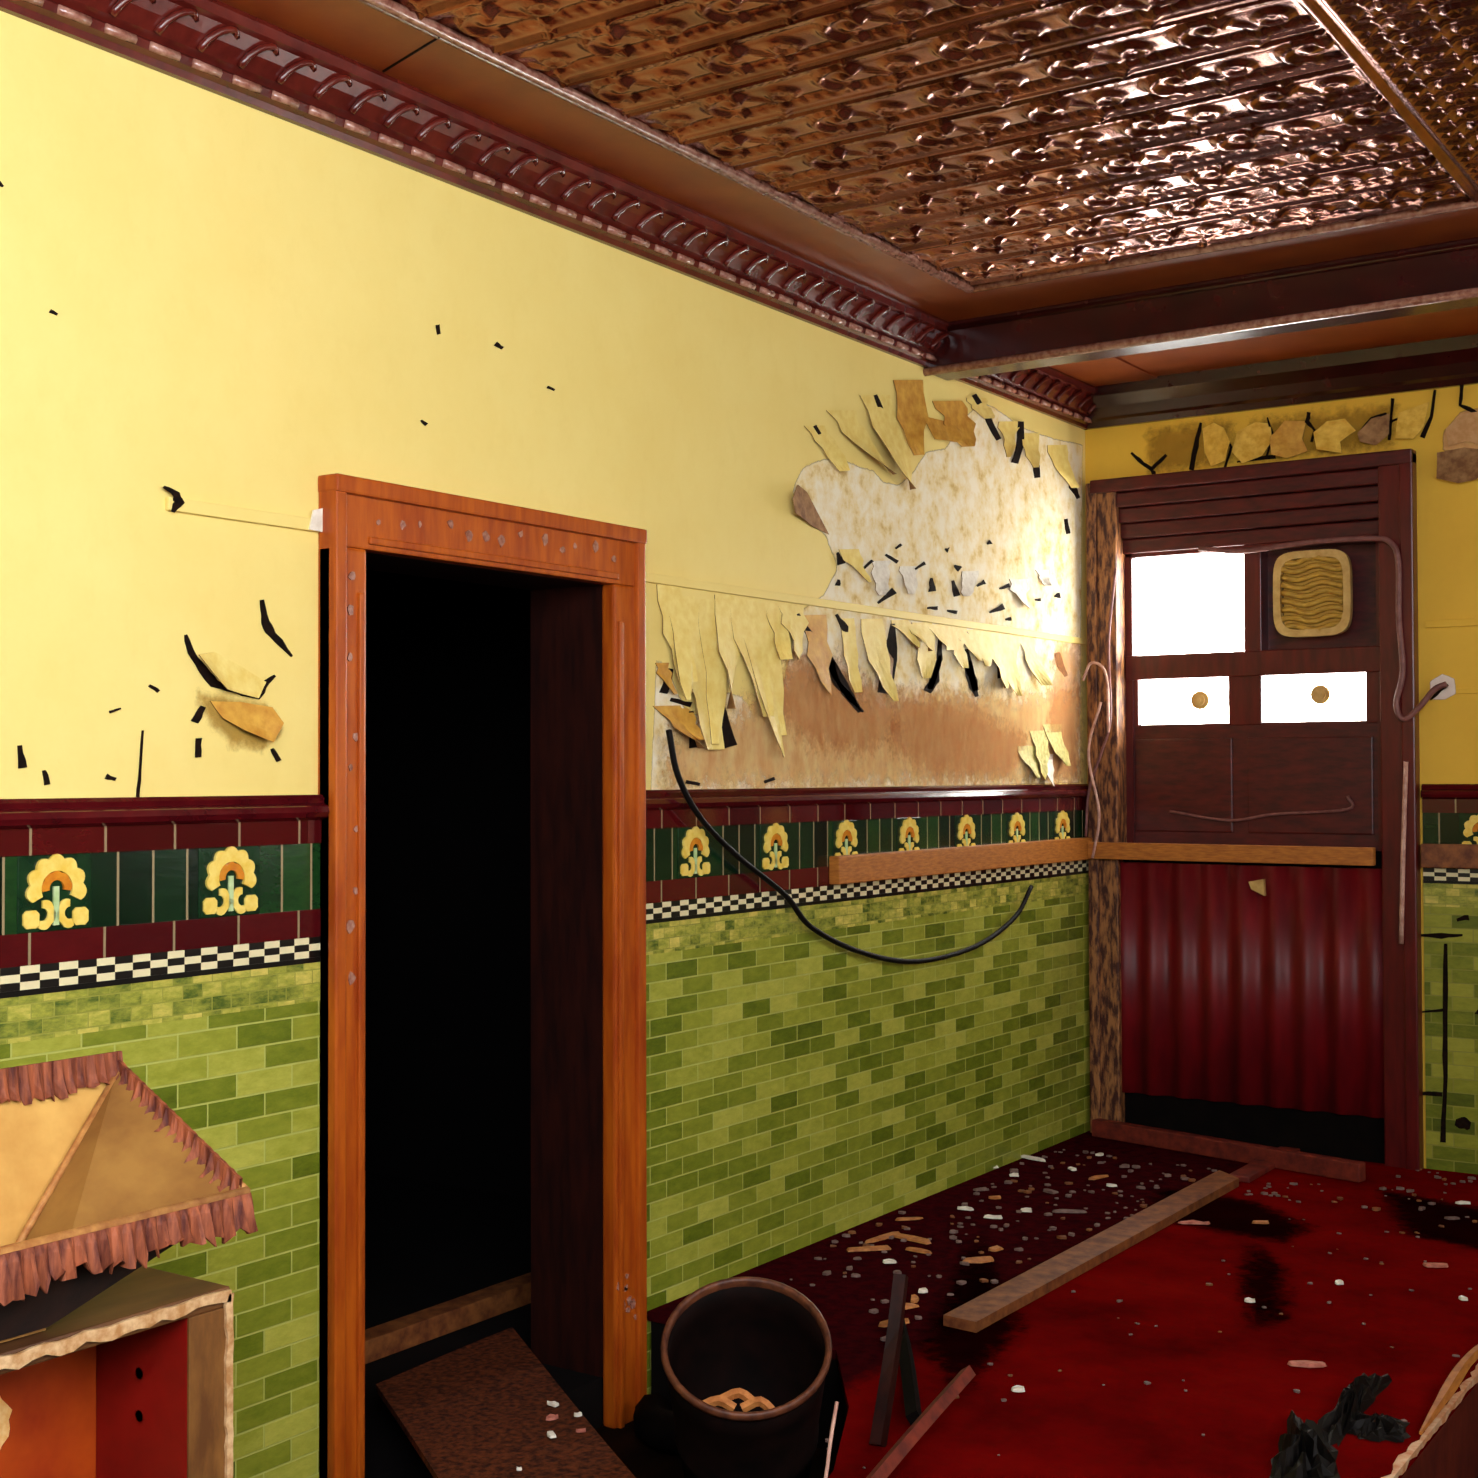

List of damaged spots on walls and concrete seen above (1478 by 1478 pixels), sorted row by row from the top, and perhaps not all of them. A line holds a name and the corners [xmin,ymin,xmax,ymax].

peeling [1202,402,1429,467]
peeling [1436,409,1478,483]
peeling [651,380,1082,790]
peeling [199,652,284,748]
spalling [17,745,50,785]